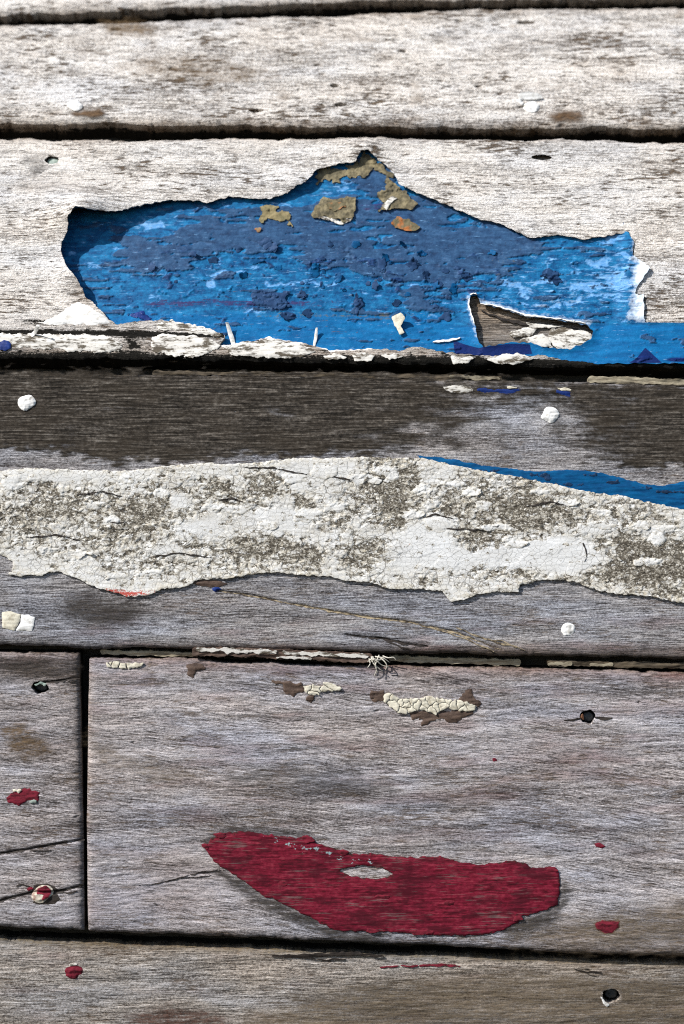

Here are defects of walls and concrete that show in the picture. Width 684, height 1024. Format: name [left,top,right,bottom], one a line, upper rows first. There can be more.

peeling [0,149,684,365]
peeling [0,455,684,603]
peeling [303,682,342,695]
peeling [383,693,476,715]
peeling [6,788,40,806]
crack [0,839,85,854]
crack [0,884,84,902]
peeling [201,831,560,936]